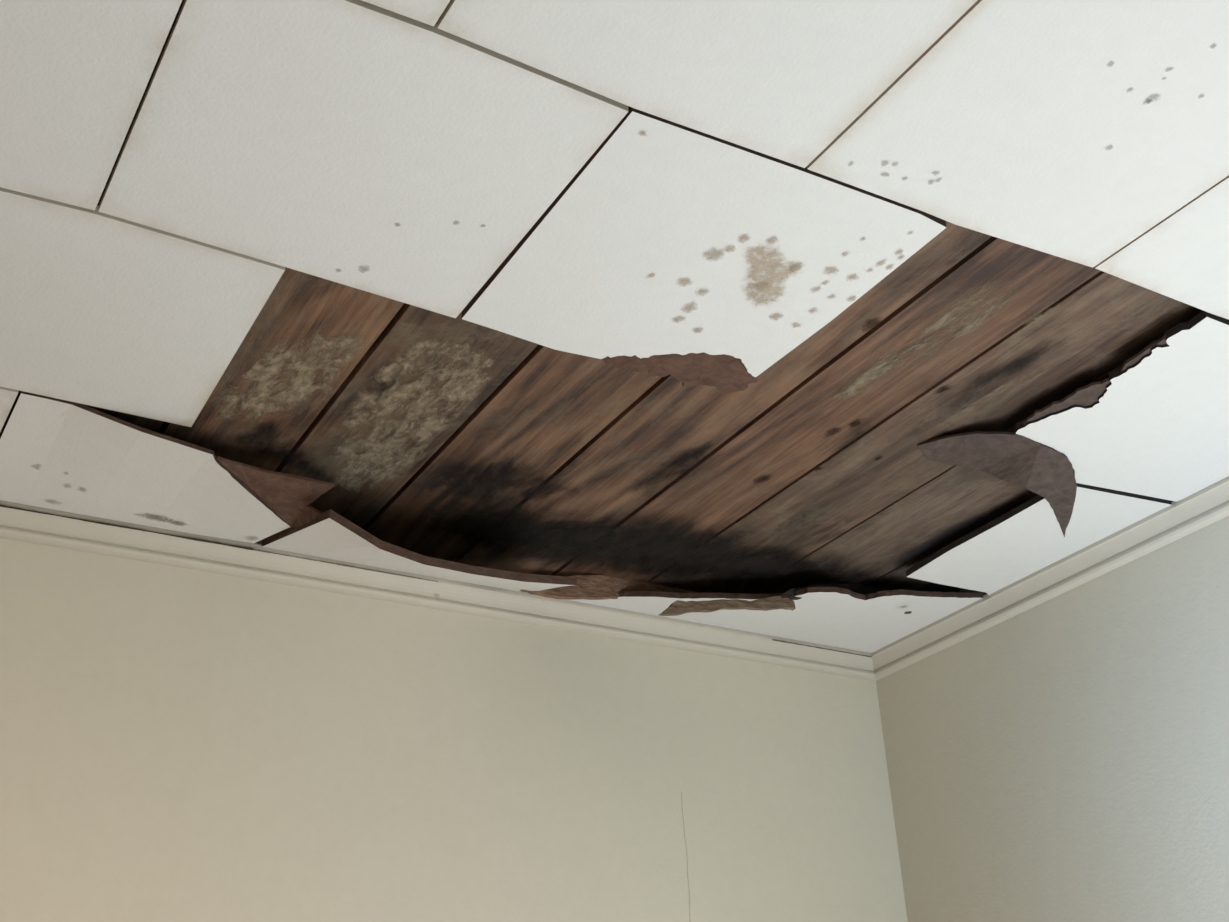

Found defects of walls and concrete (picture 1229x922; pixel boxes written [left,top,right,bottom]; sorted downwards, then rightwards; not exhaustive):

damp [707,236,801,320]
damp [220,335,494,492]
damp [639,445,710,487]
damp [435,462,889,587]
damp [899,497,1027,567]